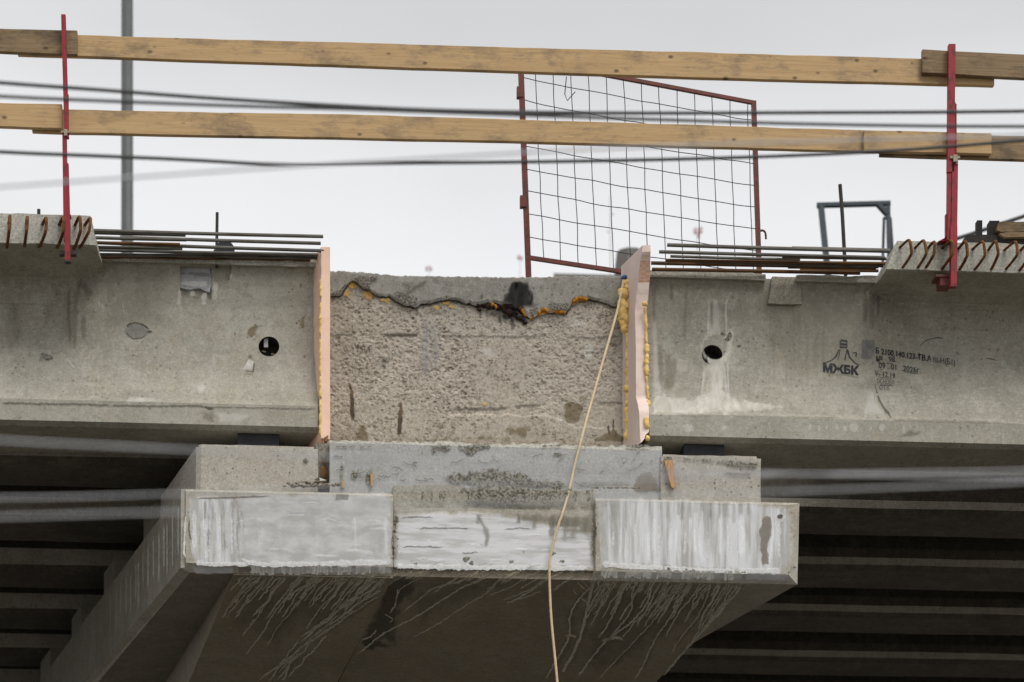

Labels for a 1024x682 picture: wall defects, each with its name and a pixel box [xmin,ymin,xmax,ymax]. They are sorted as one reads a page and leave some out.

crack [330,282,498,337]
water stain [509,281,533,304]
crack [444,299,618,338]
water stain [653,300,774,414]
water stain [138,472,790,680]